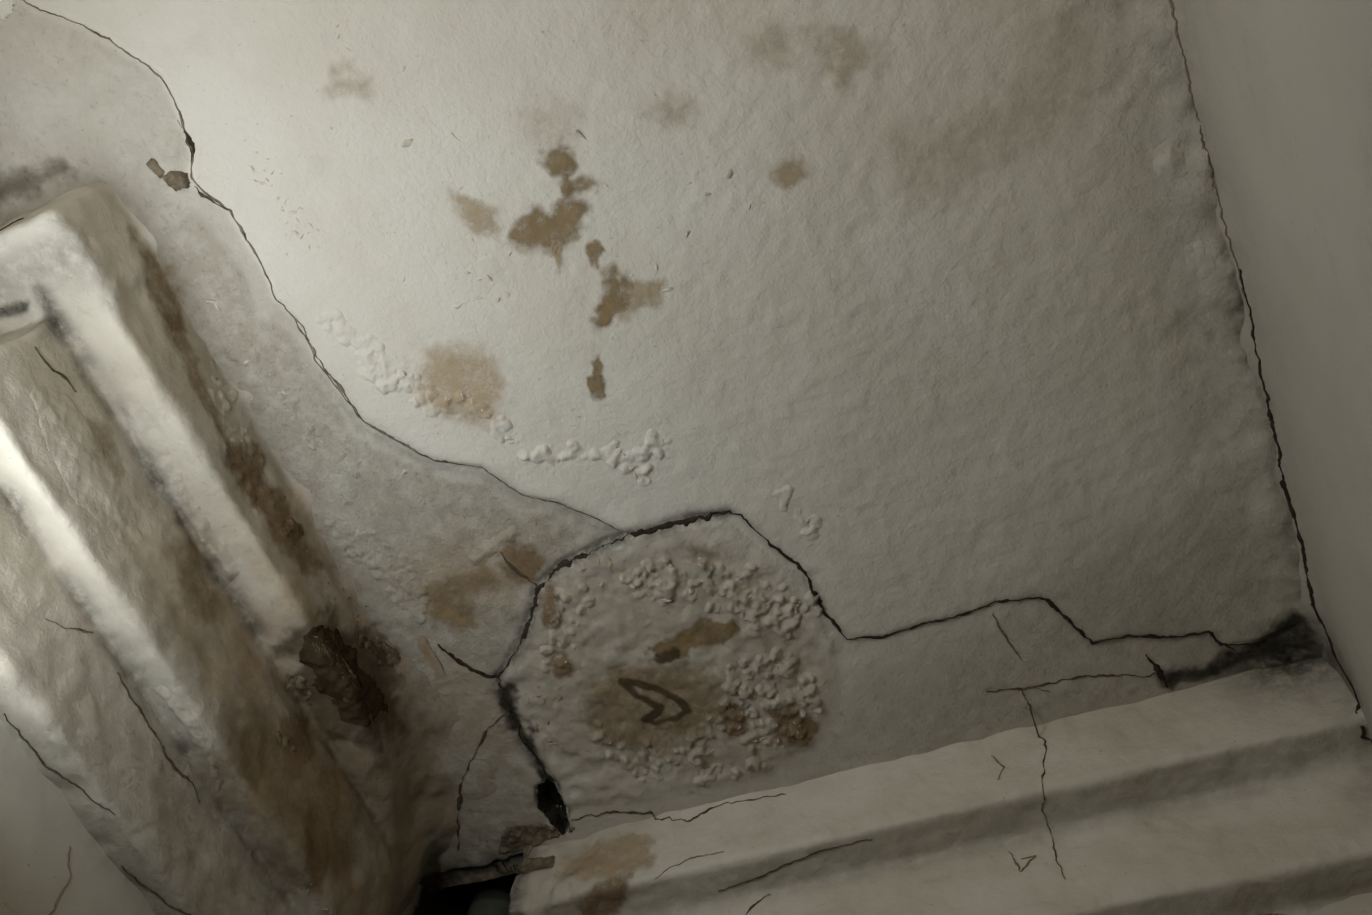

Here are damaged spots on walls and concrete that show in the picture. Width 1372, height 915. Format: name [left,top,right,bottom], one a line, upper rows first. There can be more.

peeling [141,120,192,192]
damp [509,150,661,327]
peeling [209,359,286,516]
damp [587,358,605,398]
crack [23,0,1295,785]
crack [1168,0,1372,743]
crack [4,713,115,815]
spalling [278,581,401,727]
damp [596,618,746,747]
crack [571,793,786,822]
damp [769,706,817,746]
crack [986,654,1168,879]